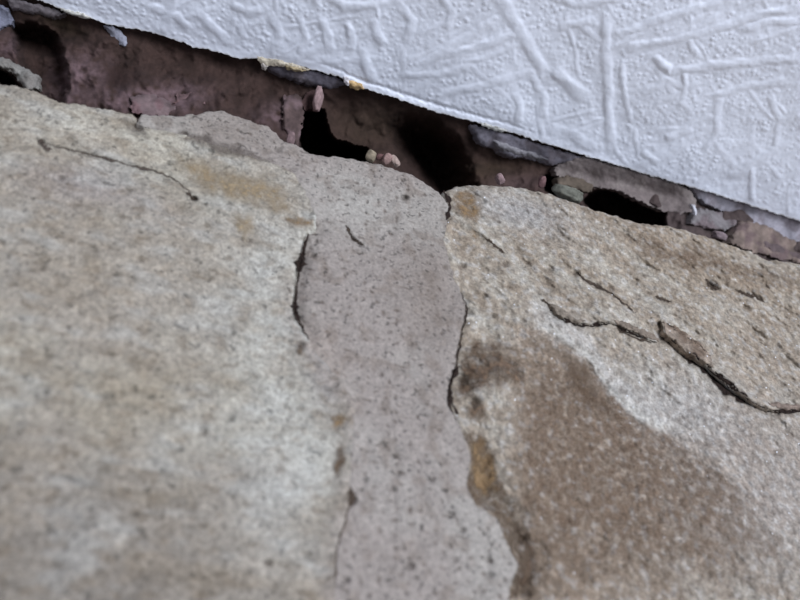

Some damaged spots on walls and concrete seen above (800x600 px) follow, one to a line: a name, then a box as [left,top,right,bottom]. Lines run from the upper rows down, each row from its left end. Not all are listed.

peeling [103,25,127,47]
spalling [312,86,324,112]
crack [38,139,198,200]
peeling [492,140,548,161]
crack [443,191,452,220]
crack [290,234,309,337]
crack [447,293,468,420]
crack [541,269,800,414]